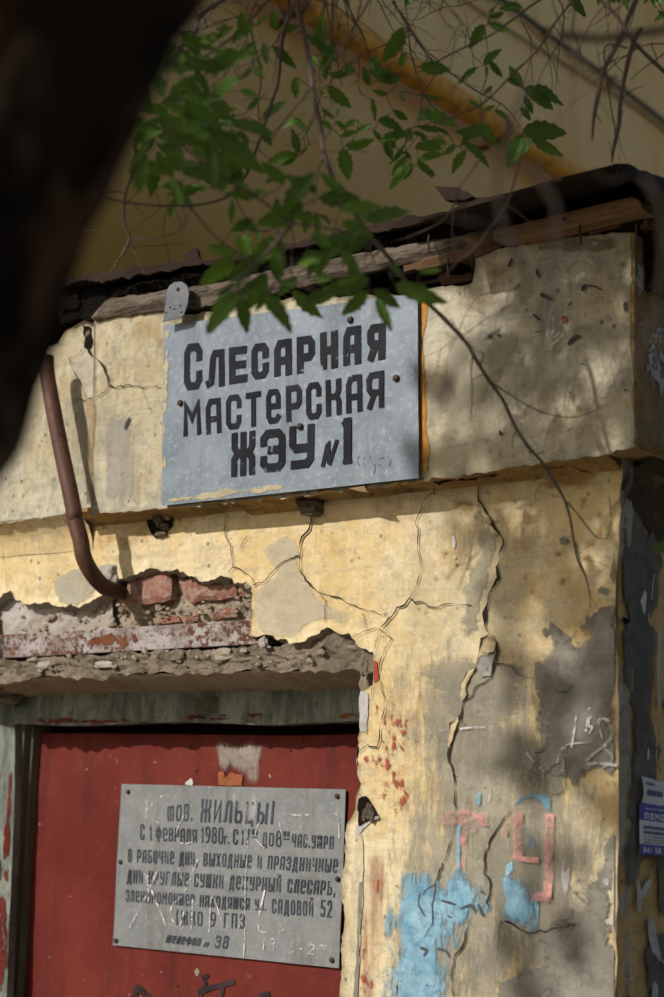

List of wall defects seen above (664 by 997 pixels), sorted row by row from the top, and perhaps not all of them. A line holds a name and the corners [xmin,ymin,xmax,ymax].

crack [65,349,162,411]
flaking render [27,650,149,678]
rust [90,633,138,649]
flaking render [0,563,252,656]
flaking render [165,636,272,668]
flaking render [348,645,379,734]
crack [224,473,533,938]
crack [535,746,568,798]
peeling [3,772,12,881]
crack [451,812,577,997]
peeling [602,871,614,938]
peeling [637,856,664,997]